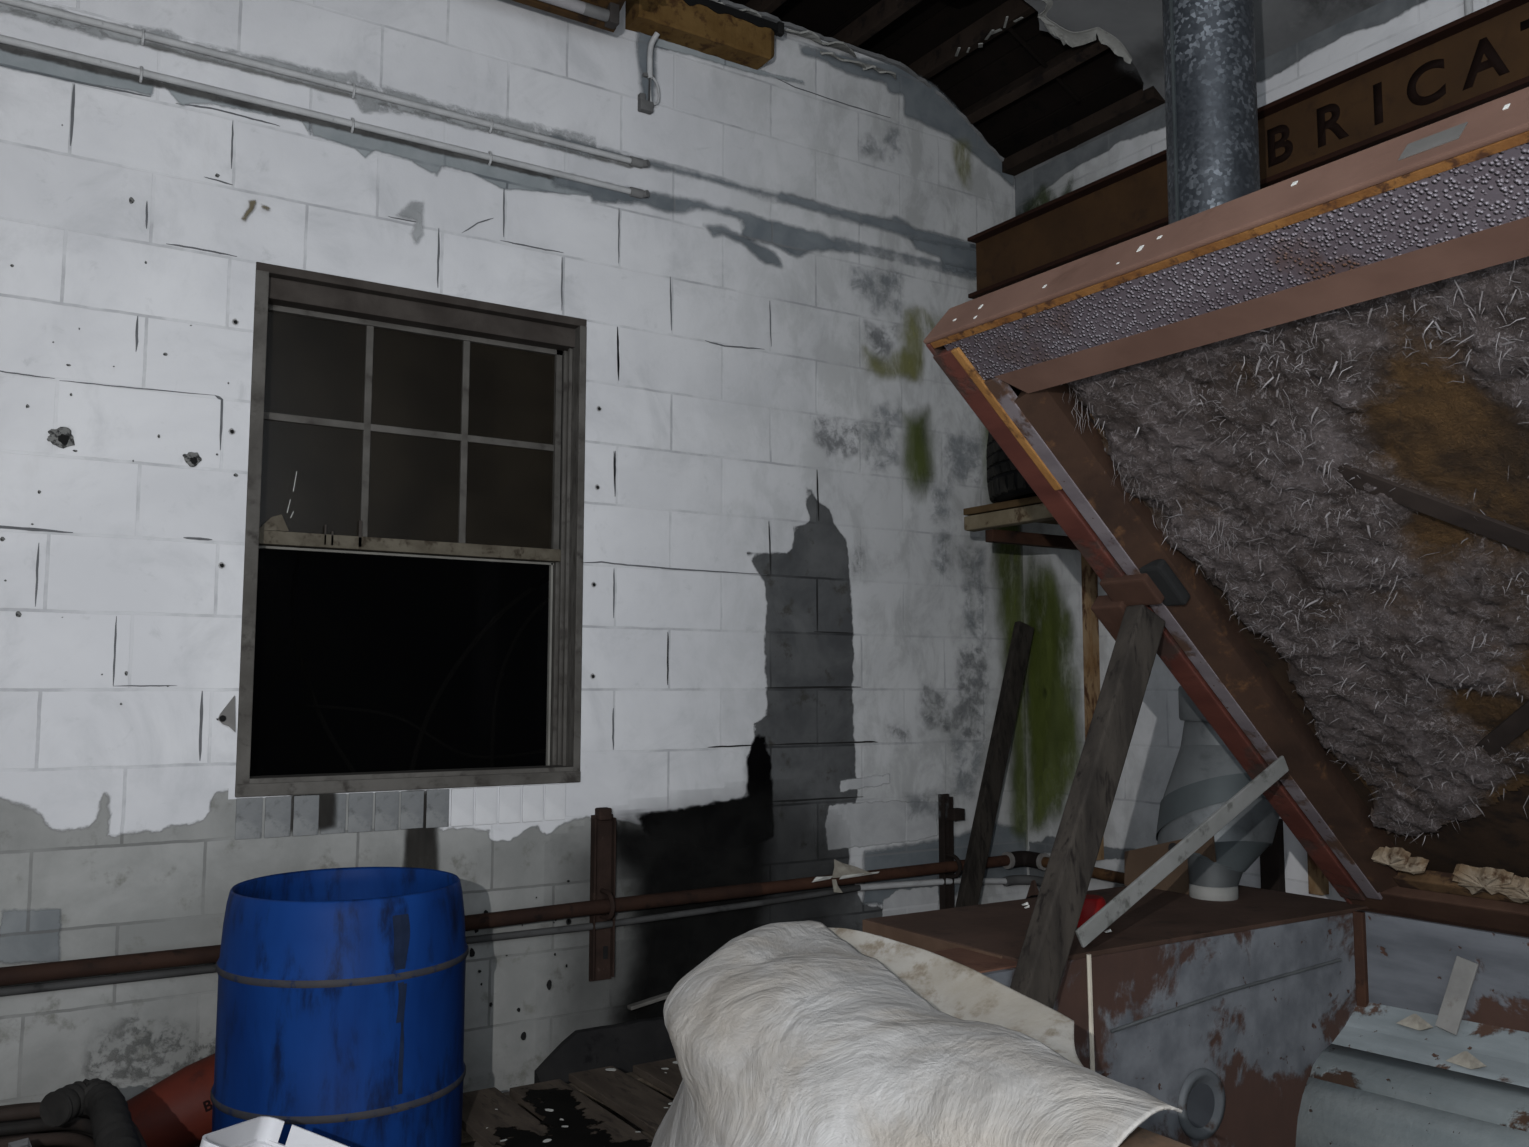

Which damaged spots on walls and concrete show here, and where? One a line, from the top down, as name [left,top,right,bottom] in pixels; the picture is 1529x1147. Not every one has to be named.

peeling [637,32,803,102]
peeling [955,0,1133,64]
peeling [1256,0,1427,82]
peeling [0,44,976,279]
peeling [784,28,1166,216]
leakage [869,350,917,375]
spalling [47,427,77,452]
leakage [906,413,932,485]
leakage [1028,598,1056,784]
peeling [0,791,407,1106]
peeling [436,817,641,1093]